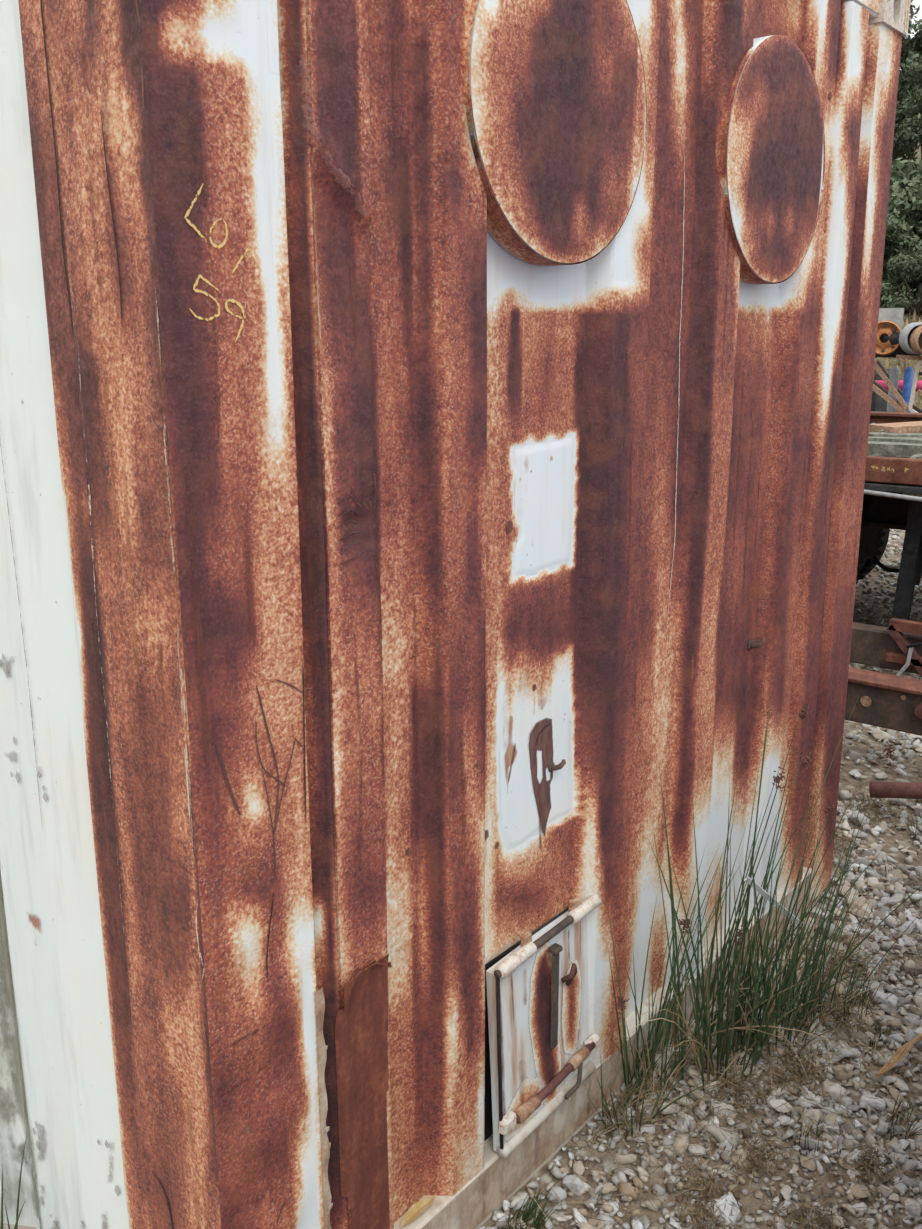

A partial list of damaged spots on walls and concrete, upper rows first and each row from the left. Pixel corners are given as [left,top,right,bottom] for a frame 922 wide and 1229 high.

rust [18,0,442,1229]
rust [433,0,902,1196]
leakage [0,934,19,1048]
leakage [1,1064,28,1123]
rust [459,1157,516,1229]